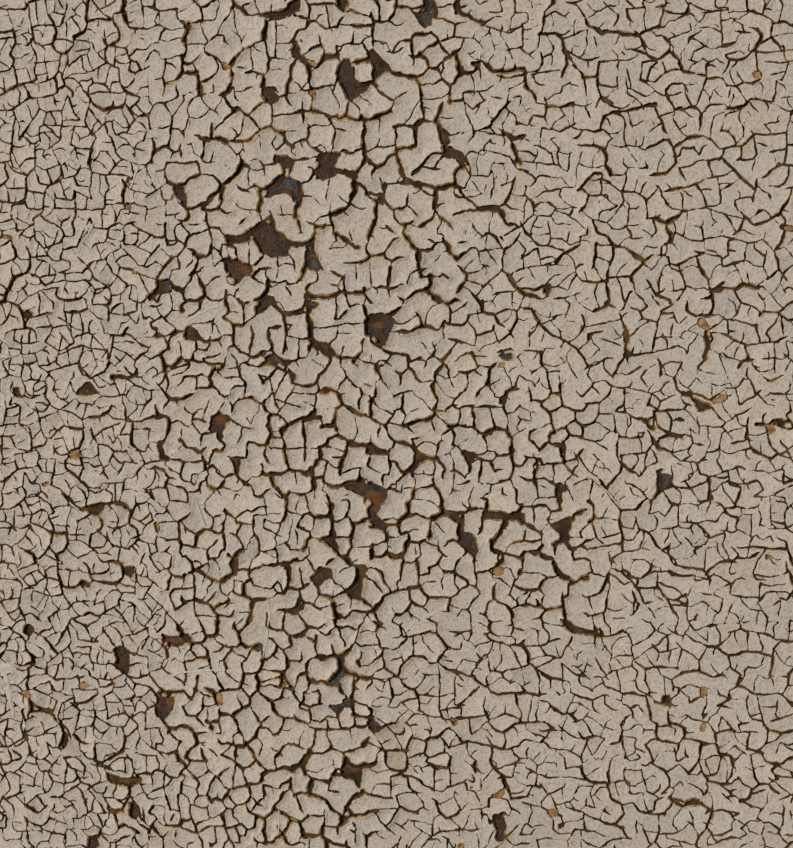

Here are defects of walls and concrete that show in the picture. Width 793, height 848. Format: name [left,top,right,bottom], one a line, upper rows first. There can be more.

crack [763,96,793,188]
peeling [116,0,516,396]
crack [759,489,793,533]
crack [134,566,158,600]
peeling [63,413,693,828]
peeling [646,668,707,731]
crack [19,817,89,848]
crack [397,819,424,848]
crack [421,791,479,848]
peeling [482,788,514,848]
crack [504,802,538,848]
peeling [667,764,713,835]